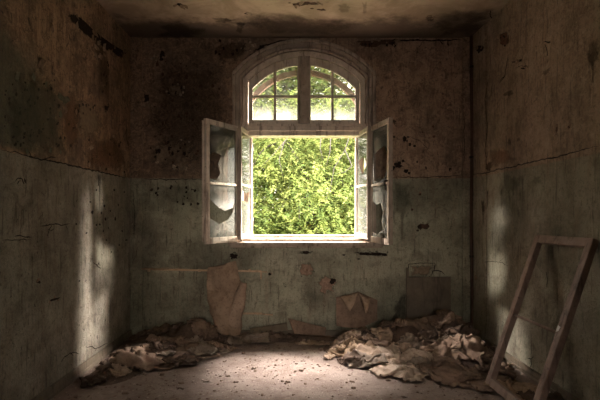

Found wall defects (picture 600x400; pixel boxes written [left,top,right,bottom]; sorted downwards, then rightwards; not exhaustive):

peeling [288,1,326,11]
peeling [68,14,127,112]
crack [393,59,598,178]
crack [4,150,125,186]